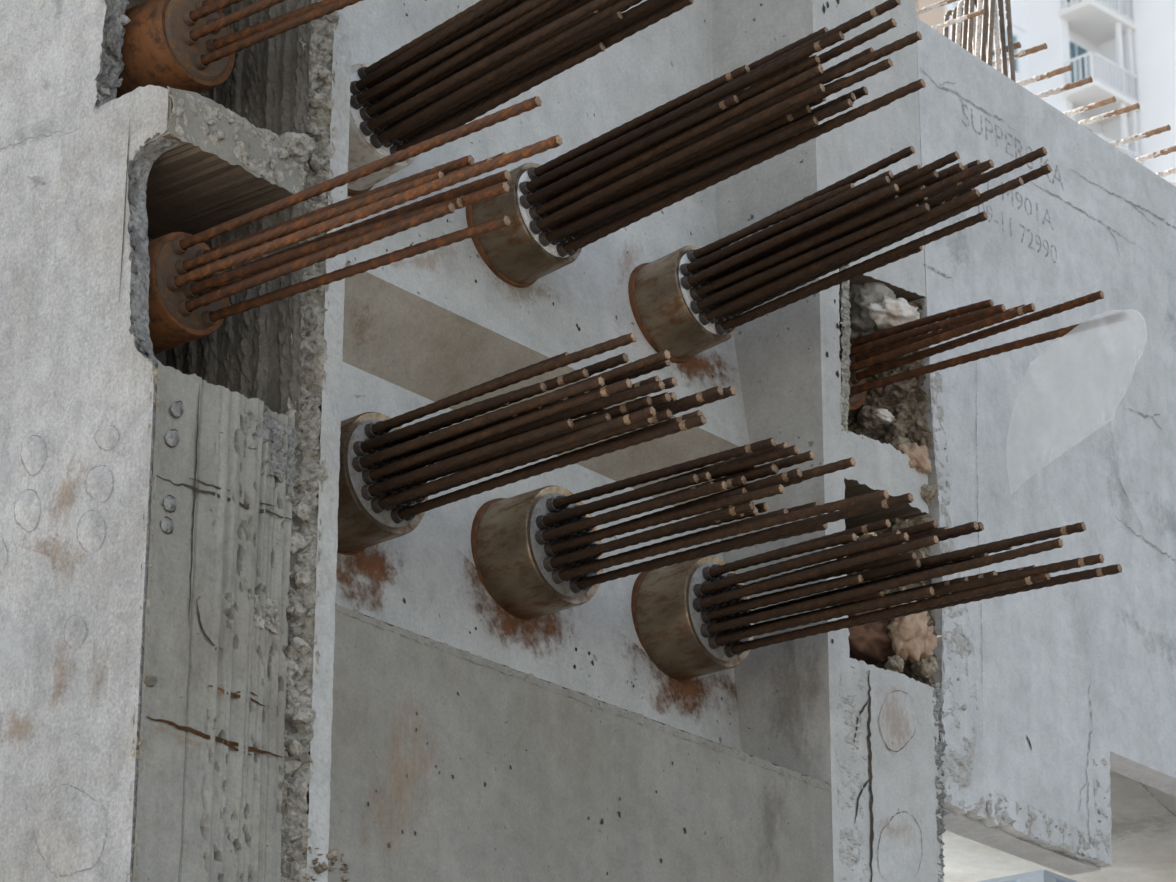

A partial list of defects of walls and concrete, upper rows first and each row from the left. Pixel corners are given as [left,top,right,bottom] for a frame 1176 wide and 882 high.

spalling [93,0,131,110]
spalling [127,5,353,432]
spalling [930,372,956,553]
spalling [126,446,158,882]
crack [147,716,283,758]
rust [336,546,394,607]
rust [472,568,562,654]
spalling [241,253,915,882]
rust [634,646,737,715]
crack [854,670,874,882]
spalling [931,603,1111,882]